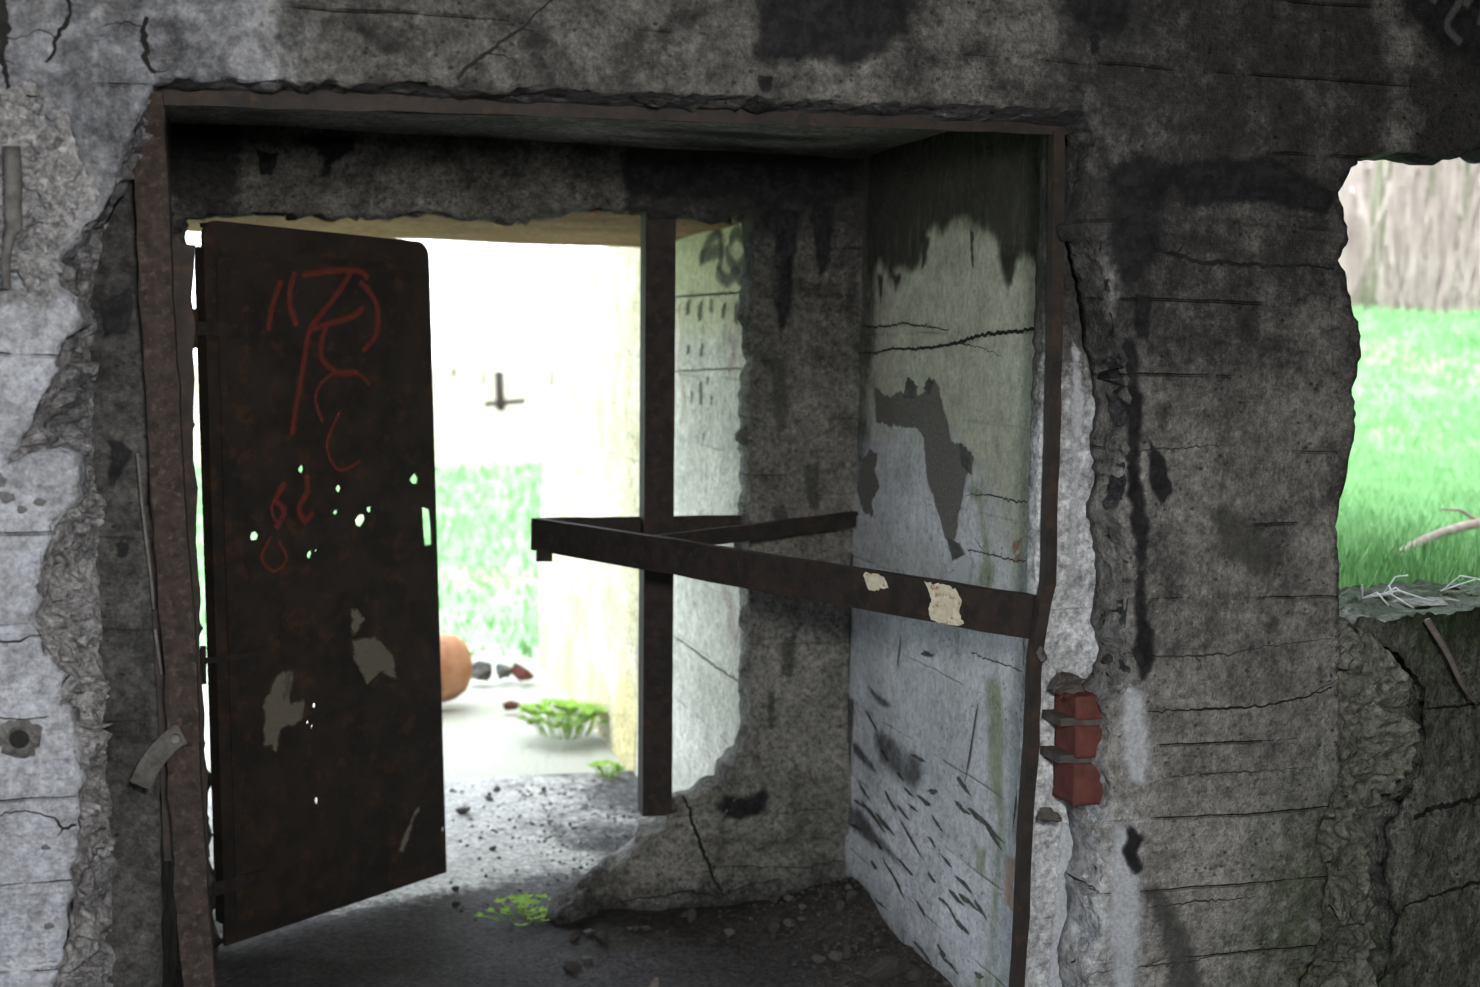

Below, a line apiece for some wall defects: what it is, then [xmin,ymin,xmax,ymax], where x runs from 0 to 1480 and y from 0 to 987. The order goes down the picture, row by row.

crack [859,322,1034,356]
spalling [0,76,1084,987]
spalling [1101,392,1129,538]
crack [0,634,42,643]
spalling [1100,559,1131,694]
crack [0,810,77,836]
flaking render [1037,671,1113,987]
spalling [1300,616,1421,987]